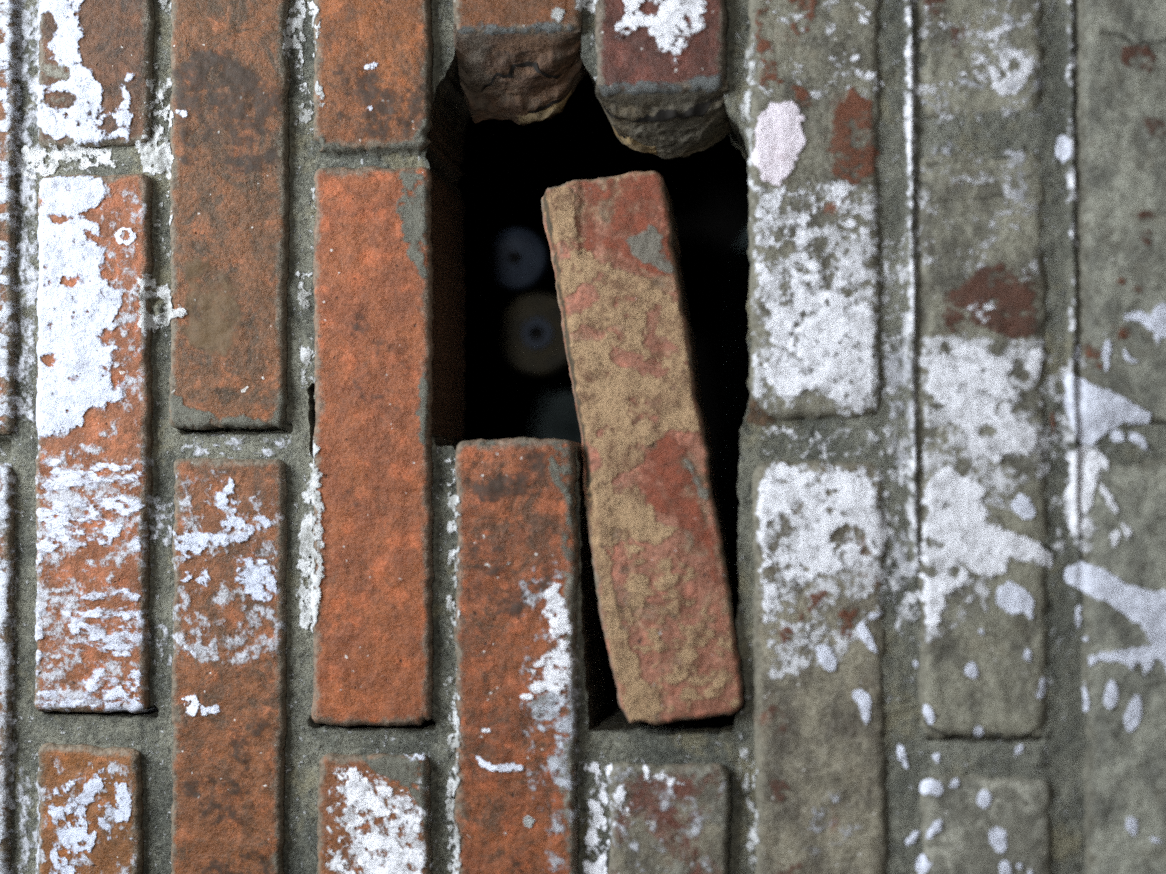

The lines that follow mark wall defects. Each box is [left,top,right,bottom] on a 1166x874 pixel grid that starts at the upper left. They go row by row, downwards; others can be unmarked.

crack [1102,32,1166,46]